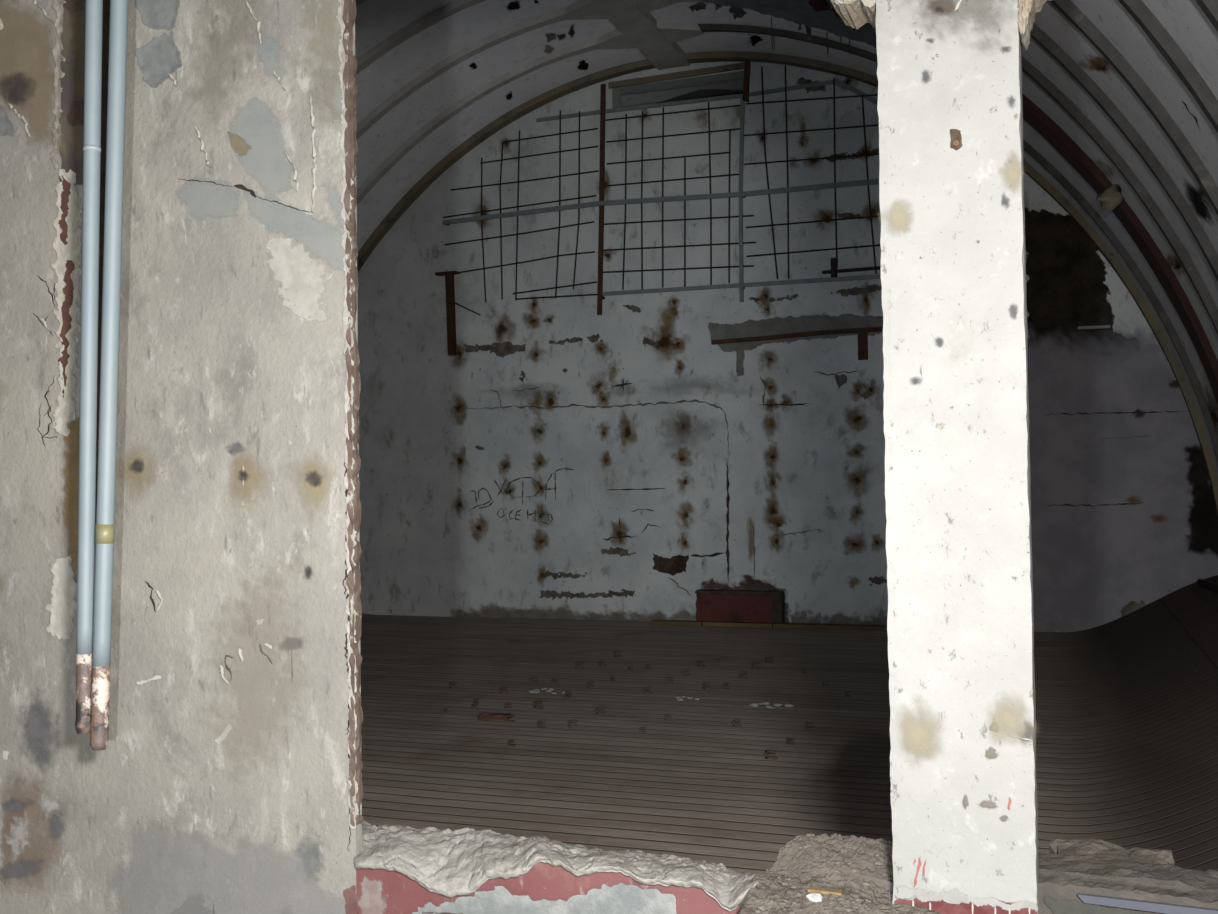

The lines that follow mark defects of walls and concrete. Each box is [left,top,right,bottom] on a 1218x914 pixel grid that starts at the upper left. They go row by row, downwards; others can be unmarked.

peeling [545,24,575,54]
leakage [0,10,63,146]
crack [181,179,313,213]
crack [34,275,55,336]
corrosion [655,299,685,371]
corrosion [711,327,883,365]
crack [37,378,58,444]
peeling [266,0,359,830]
corrosion [602,418,636,445]
corrosion [764,380,792,550]
peeling [45,556,77,640]
leakage [0,786,63,878]